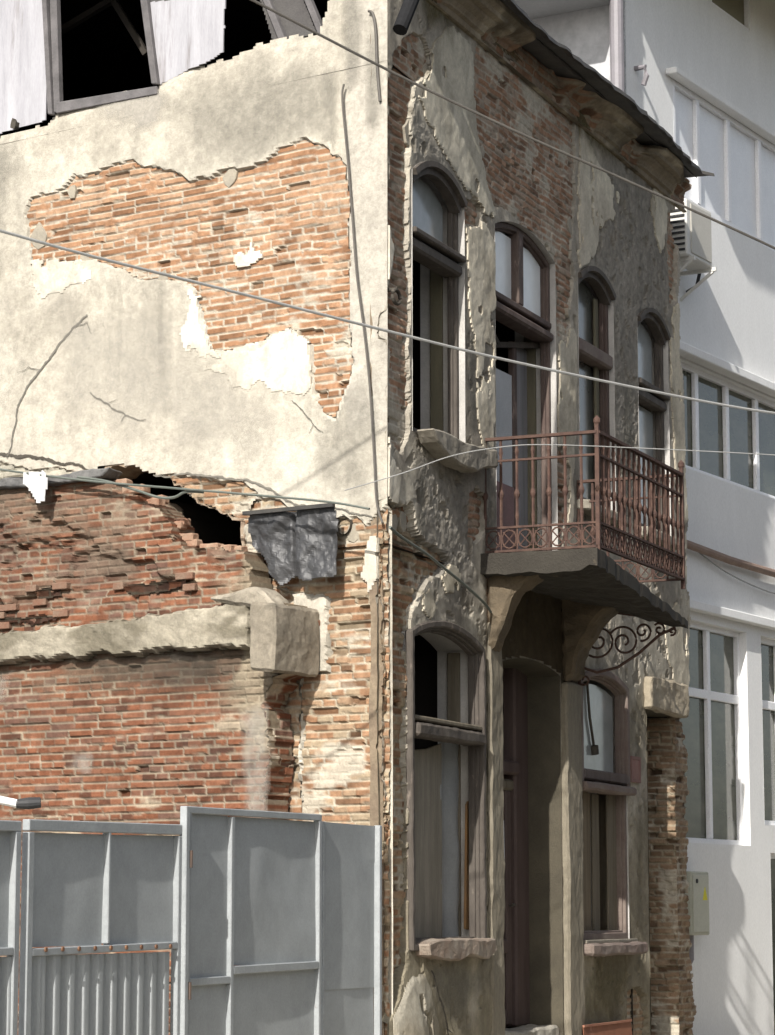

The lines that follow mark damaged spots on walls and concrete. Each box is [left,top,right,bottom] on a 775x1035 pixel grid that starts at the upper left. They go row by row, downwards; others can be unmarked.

spalling [0,582,71,630]
spalling [0,464,72,479]
crack [0,314,91,470]
spalling [27,140,353,417]
spalling [98,26,620,1035]
spalling [675,718,697,1035]